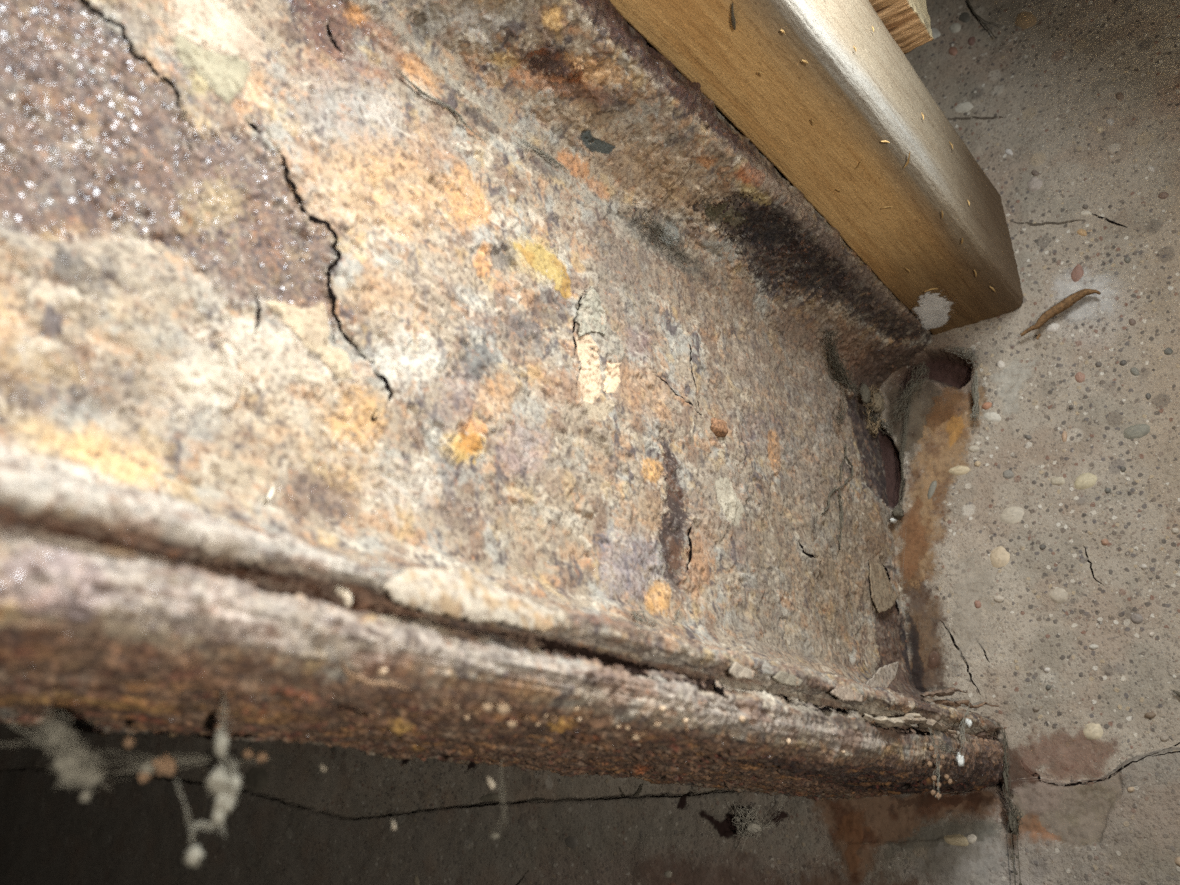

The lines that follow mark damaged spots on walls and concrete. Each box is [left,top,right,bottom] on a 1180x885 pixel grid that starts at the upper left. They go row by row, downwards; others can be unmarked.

crack [81,0,187,122]
crack [326,22,342,52]
crack [247,123,393,421]
corrosion [513,242,607,338]
corrosion [772,389,984,714]
corrosion [1,518,755,698]
crack [105,775,203,786]
crack [239,789,734,820]
corrosion [872,724,933,736]
corrosion [815,748,1037,885]
crack [1021,742,1180,786]